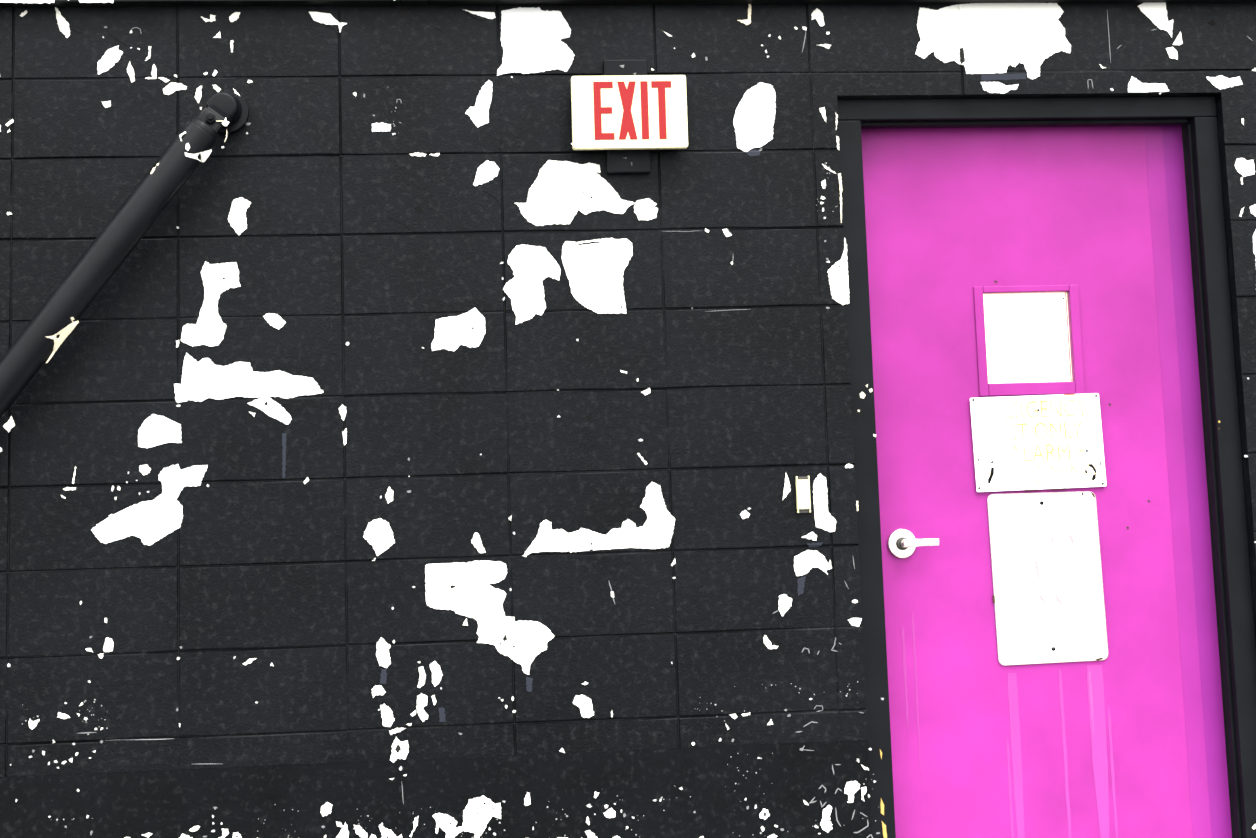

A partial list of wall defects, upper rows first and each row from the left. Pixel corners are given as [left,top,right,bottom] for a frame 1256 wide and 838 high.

peeling [462,7,574,128]
peeling [915,3,1071,94]
peeling [733,82,776,152]
peeling [515,160,658,226]
peeling [503,238,633,325]
peeling [174,261,321,425]
peeling [431,308,486,351]
peeling [138,414,182,448]
peeling [91,464,208,546]
peeling [523,482,676,566]
peeling [425,532,554,675]
peeling [320,795,501,838]